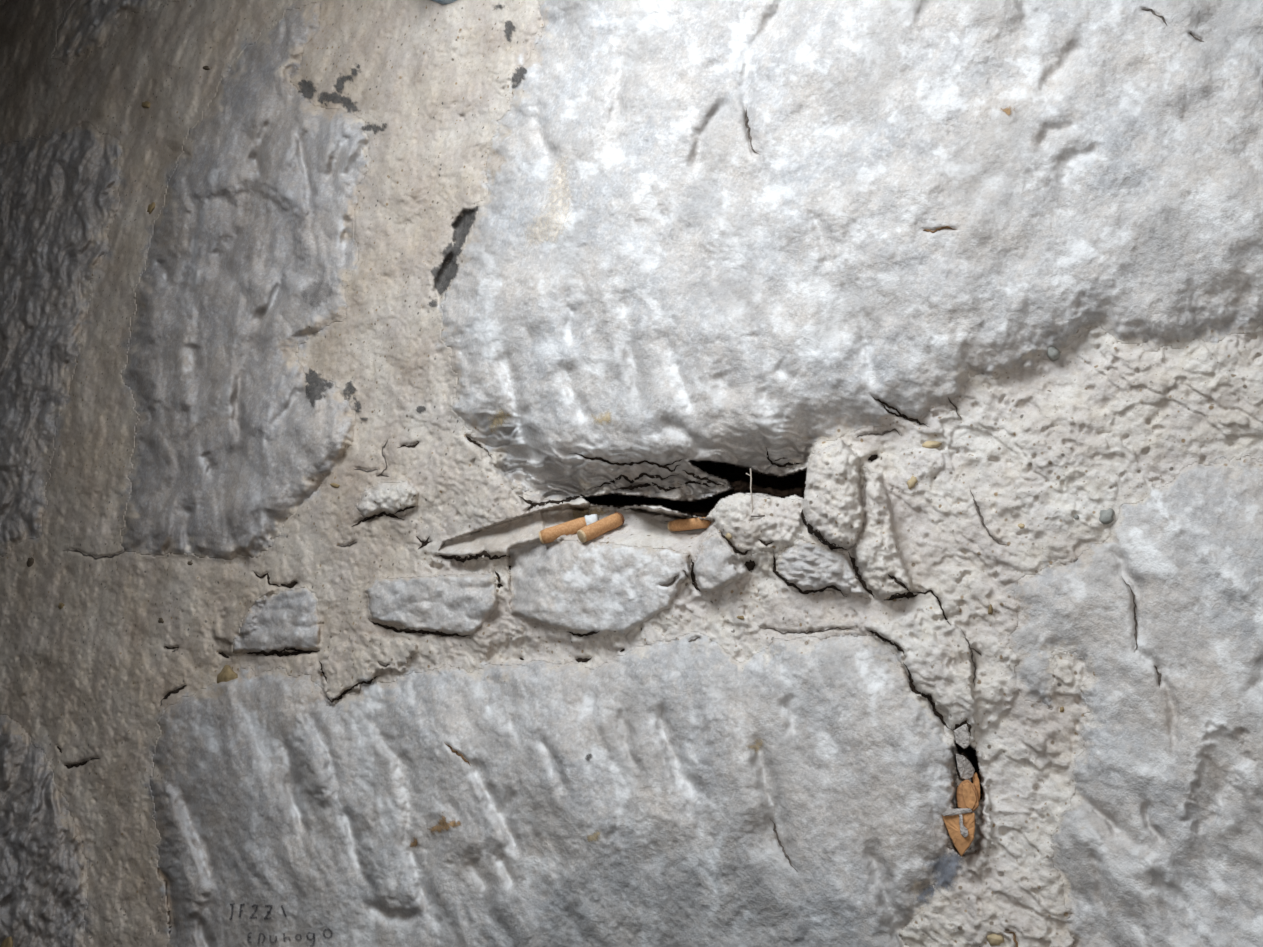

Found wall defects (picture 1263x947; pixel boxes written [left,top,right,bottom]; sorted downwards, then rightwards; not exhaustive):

crack [466,436,492,458]
crack [519,453,724,510]
spalling [584,461,806,517]
crack [766,448,799,467]
crack [857,395,928,462]
crack [970,490,1001,544]
crack [661,559,700,591]
crack [721,509,982,687]
crack [569,631,625,662]
crack [762,627,971,736]
crack [444,742,470,765]
crack [770,819,797,871]